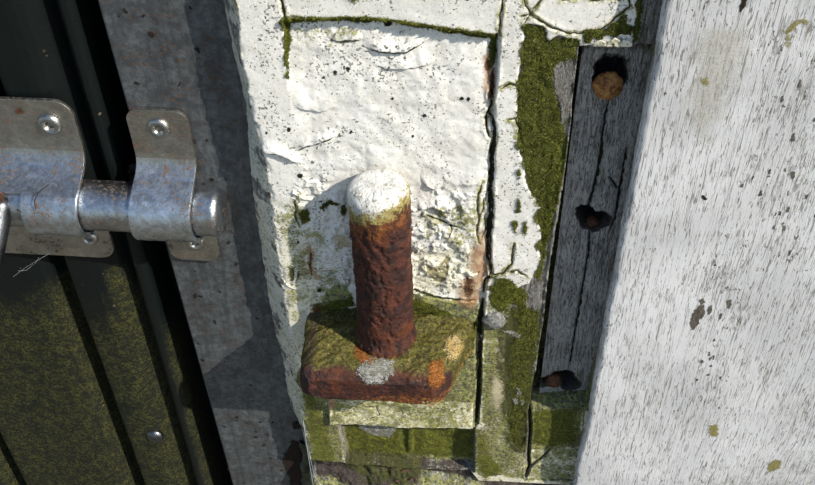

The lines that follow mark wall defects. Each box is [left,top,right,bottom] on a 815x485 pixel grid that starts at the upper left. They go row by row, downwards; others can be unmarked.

crack [498,0,631,34]
corrosion [484,52,495,99]
peeling [292,190,313,204]
peeling [283,265,306,290]
corrosion [308,245,321,280]
spalling [426,256,477,283]
crack [413,83,526,419]
corrosion [456,232,490,308]
corrosion [351,344,377,365]
corrosion [425,335,464,390]